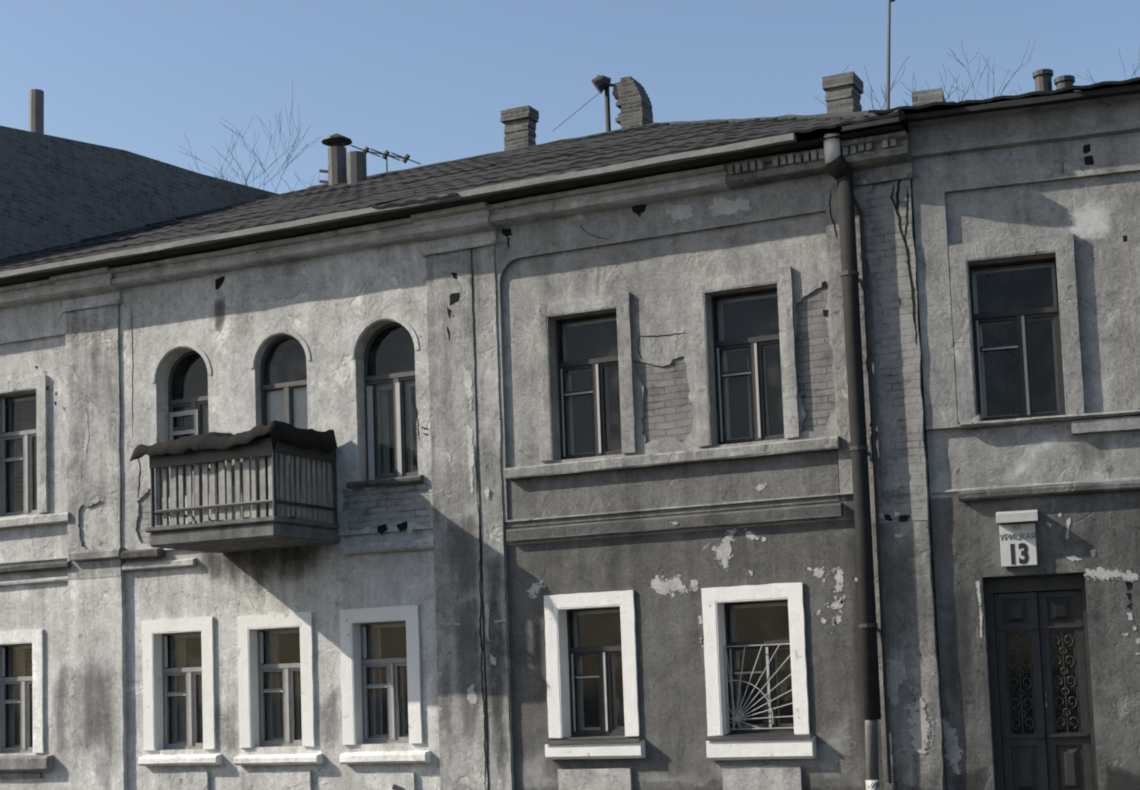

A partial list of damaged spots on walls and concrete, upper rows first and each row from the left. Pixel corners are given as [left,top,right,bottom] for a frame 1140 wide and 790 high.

flaking render [795,281,835,432]
crack [890,179,930,485]
flaking render [635,357,693,443]
damp [205,546,316,582]
peeling [650,574,699,598]
peeling [703,527,766,571]
peeling [807,567,858,634]
peeling [1066,549,1140,655]
damp [460,605,476,719]
damp [491,595,505,761]
damp [718,733,845,774]
damp [1105,769,1140,790]